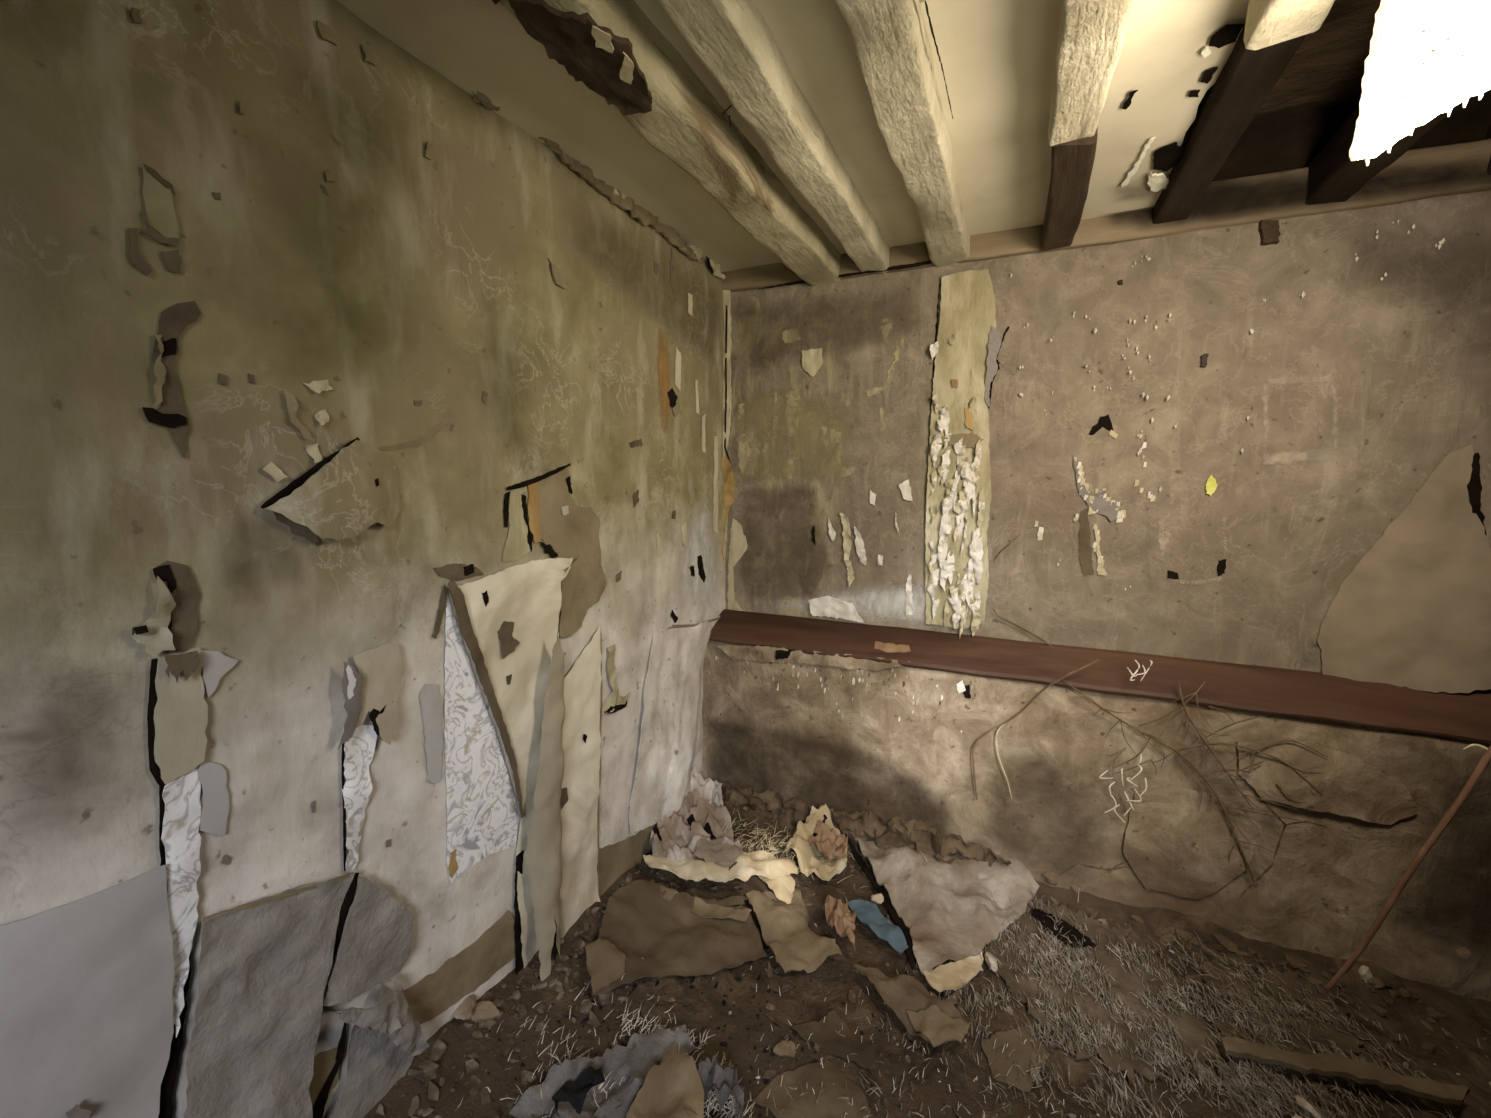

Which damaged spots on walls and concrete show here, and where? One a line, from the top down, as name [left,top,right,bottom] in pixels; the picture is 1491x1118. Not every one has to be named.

peeling [508,0,652,116]
flaking render [538,137,725,279]
peeling [153,335,166,406]
peeling [930,334,955,360]
peeling [283,379,333,463]
peeling [263,462,289,482]
peeling [895,479,913,532]
peeling [905,394,986,638]
flaking render [434,563,484,581]
peeling [808,513,883,623]
leakage [833,590,926,620]